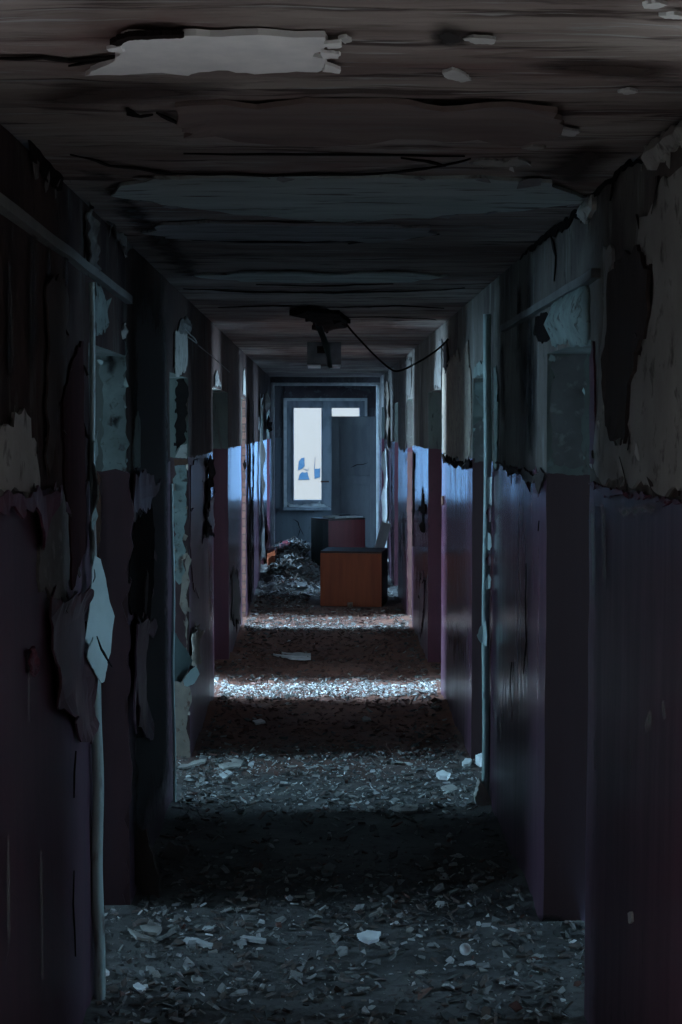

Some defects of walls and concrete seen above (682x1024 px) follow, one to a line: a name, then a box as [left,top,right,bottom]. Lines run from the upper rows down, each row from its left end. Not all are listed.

spalling [86,28,352,76]
peeling [442,67,471,82]
peeling [463,34,496,45]
crack [70,153,471,177]
spalling [589,120,682,498]
peeling [434,339,546,590]
peeling [0,316,216,905]